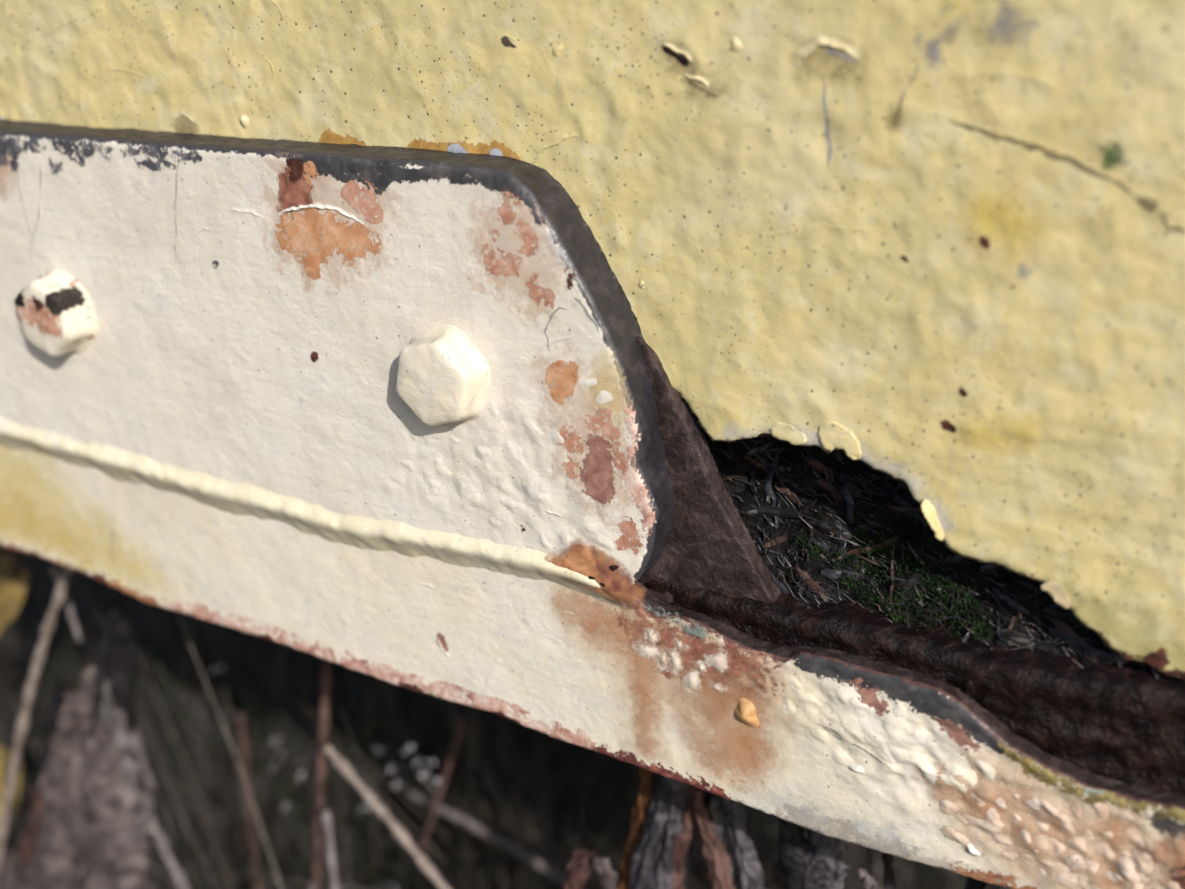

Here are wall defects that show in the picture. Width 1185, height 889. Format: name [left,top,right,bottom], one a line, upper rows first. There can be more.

peeling [0,117,202,175]
rust [272,157,384,279]
crack [947,115,1185,238]
rust [14,279,94,342]
peeling [769,421,862,460]
peeling [921,499,944,541]
peeling [1041,581,1070,609]
rust [0,542,730,800]
rust [558,578,1185,794]
peeling [793,654,1009,754]
rust [936,768,1127,889]
rust [1140,839,1185,889]